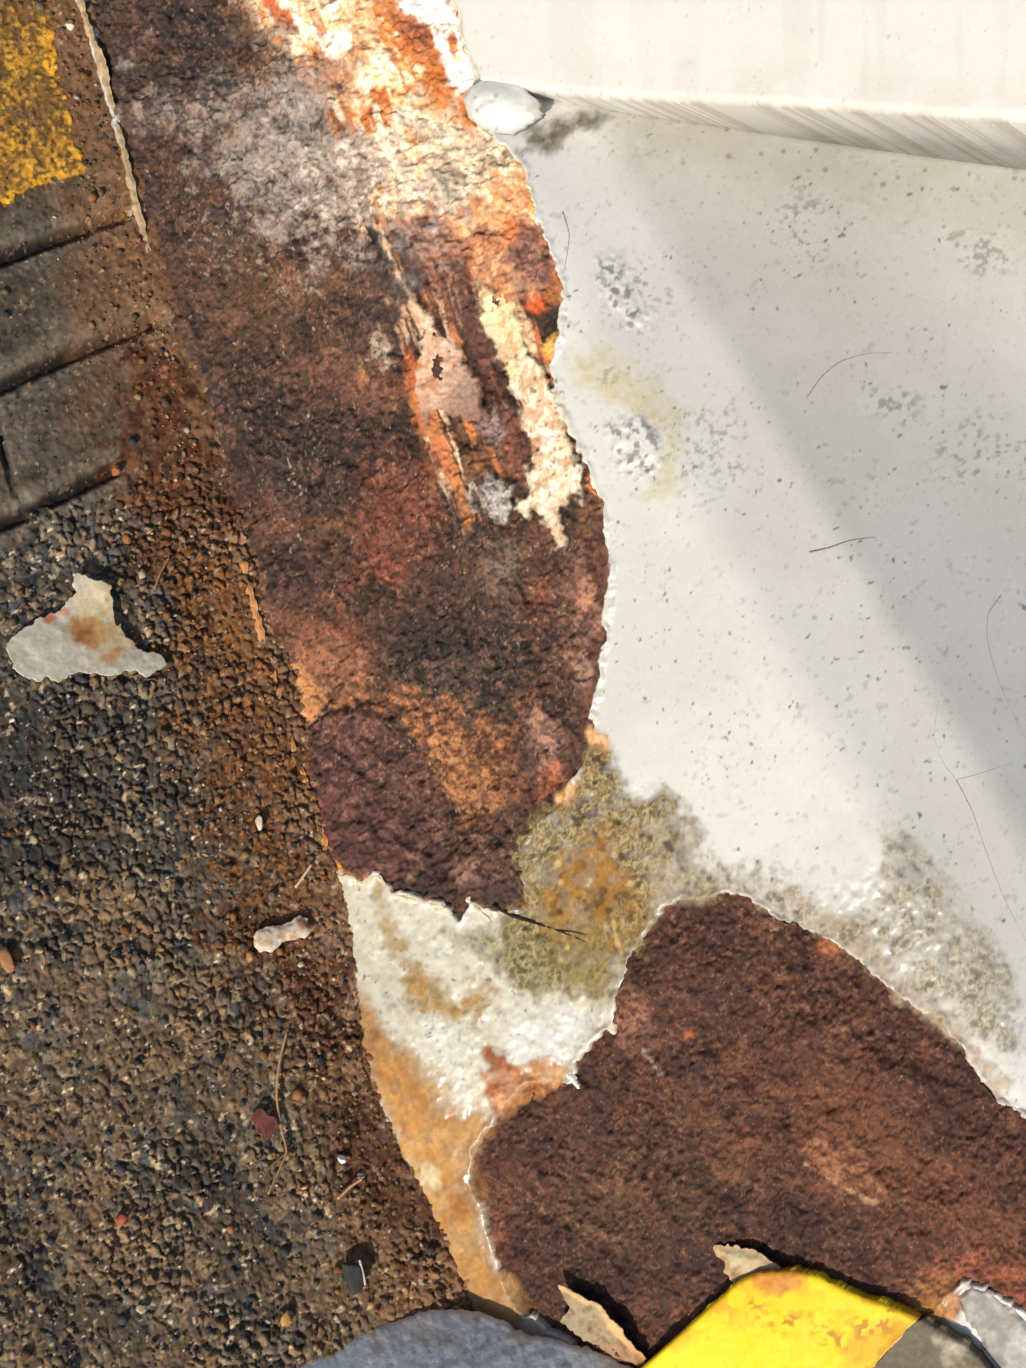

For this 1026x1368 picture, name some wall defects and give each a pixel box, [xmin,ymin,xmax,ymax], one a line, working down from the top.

rust [76,0,609,968]
water stain [709,837,1016,1099]
rust [221,893,1026,1368]
peeling [558,1284,646,1366]
peeling [713,1243,781,1283]